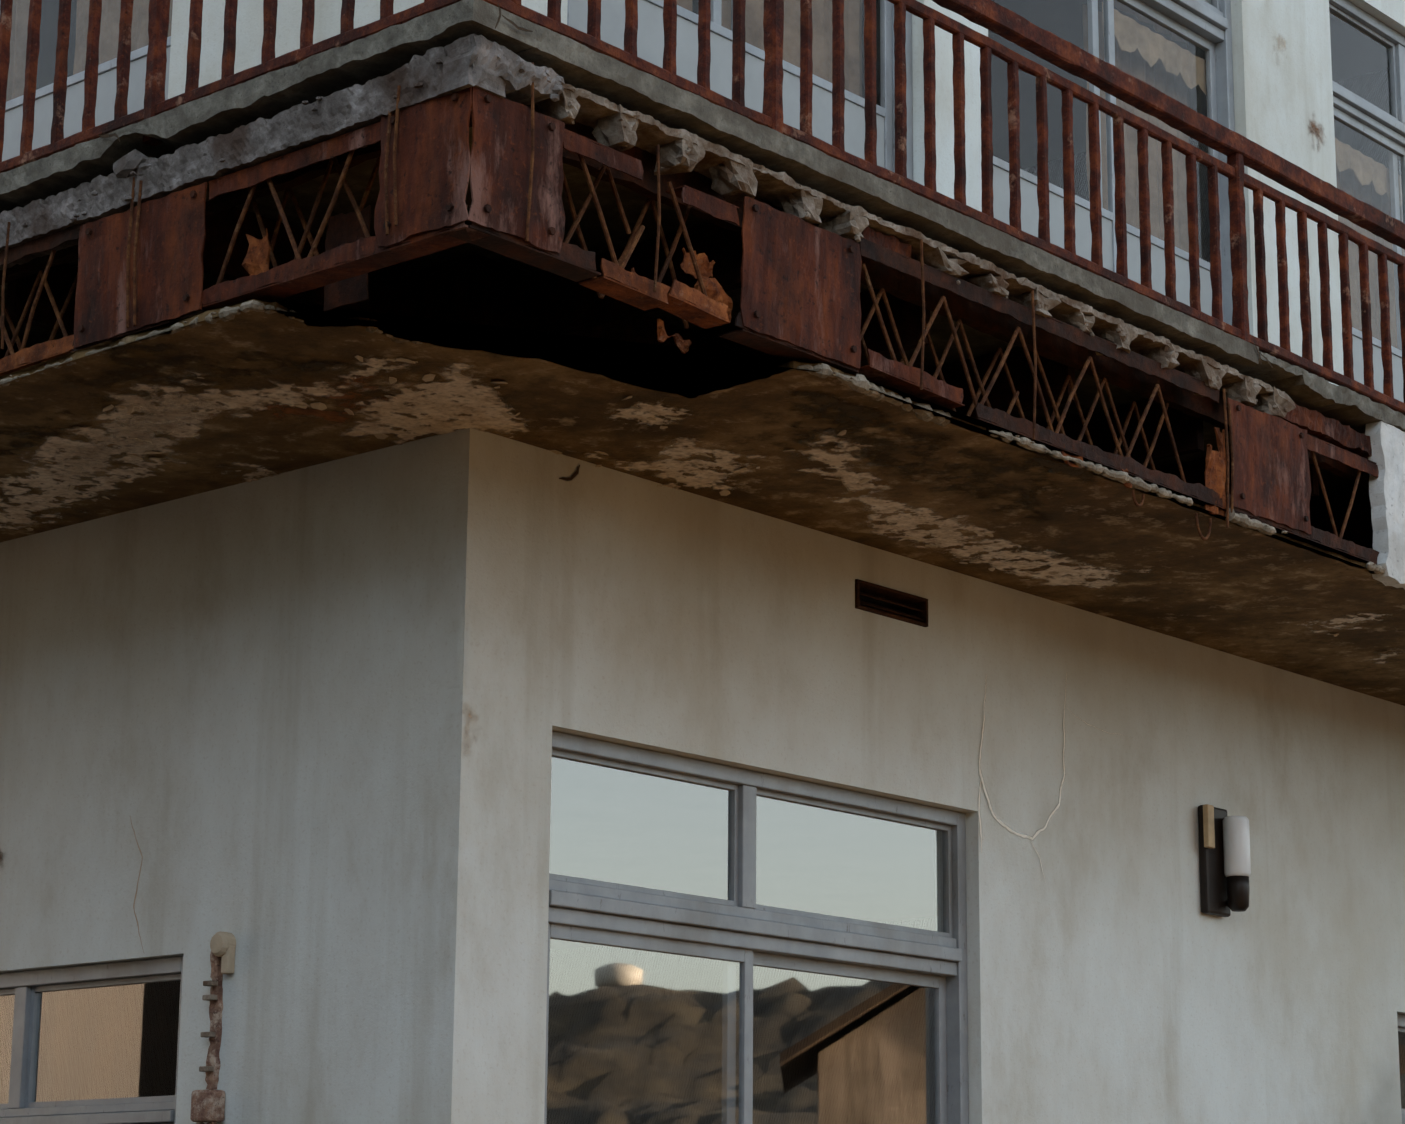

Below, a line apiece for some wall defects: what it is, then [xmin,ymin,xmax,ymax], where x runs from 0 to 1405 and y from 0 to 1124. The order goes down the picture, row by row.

spalling [0,34,1372,458]
water stain [77,344,352,401]
corrosion [253,375,384,425]
water stain [791,391,1096,520]